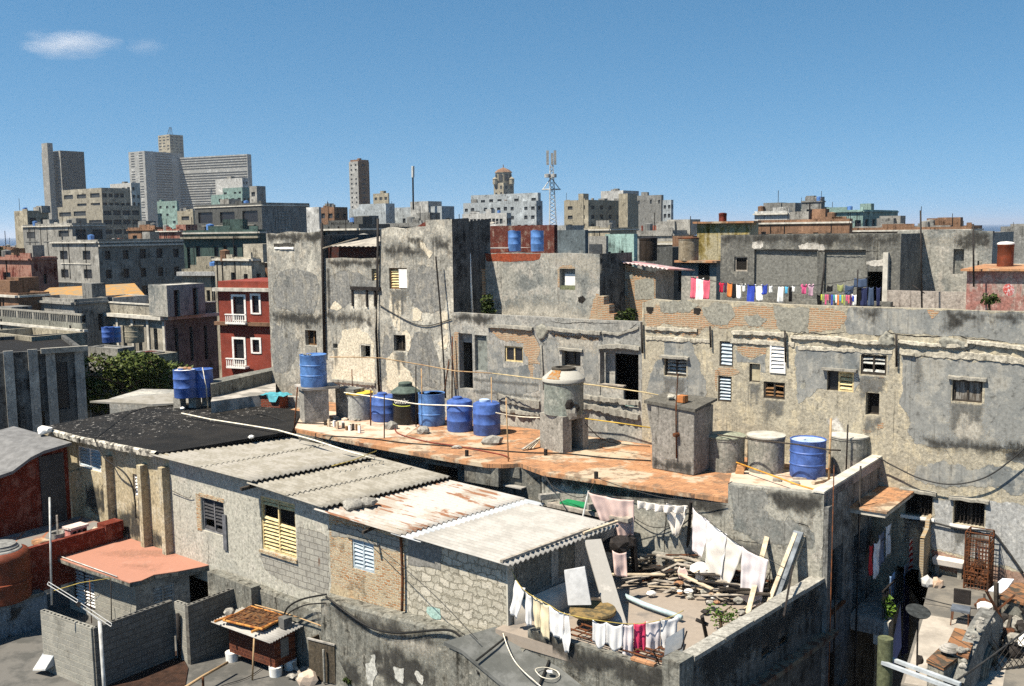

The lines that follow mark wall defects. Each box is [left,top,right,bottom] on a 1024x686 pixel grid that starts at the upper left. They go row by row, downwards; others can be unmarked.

damp [272,238,422,328]
peeling [331,240,458,390]
peeling [489,328,600,397]
peeling [625,271,1024,586]
damp [926,439,1024,460]
peeling [365,655,377,686]
peeling [393,667,423,685]